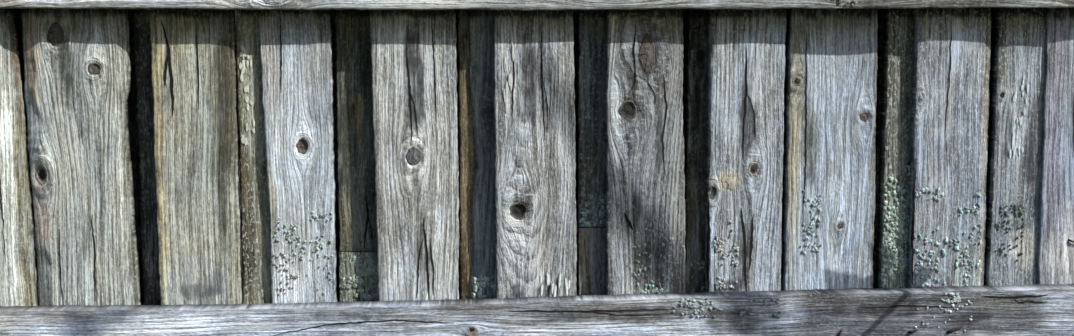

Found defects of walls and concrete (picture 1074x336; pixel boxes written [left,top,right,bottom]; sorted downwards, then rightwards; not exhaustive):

crack [161,20,199,116]
crack [742,46,756,160]